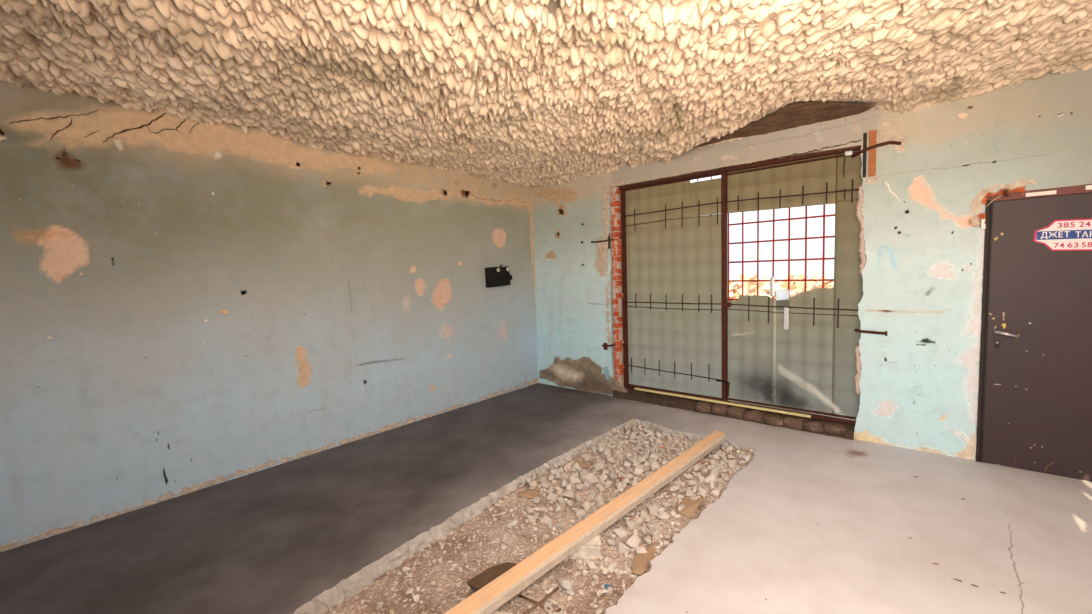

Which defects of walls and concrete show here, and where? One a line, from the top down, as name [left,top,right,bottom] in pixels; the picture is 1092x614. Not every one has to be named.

crack [9,109,199,143]
peeling [17,110,389,174]
peeling [904,178,1036,240]
spalling [0,186,627,552]
spalling [853,346,862,395]
peeling [962,288,1006,422]
peeling [854,431,977,461]